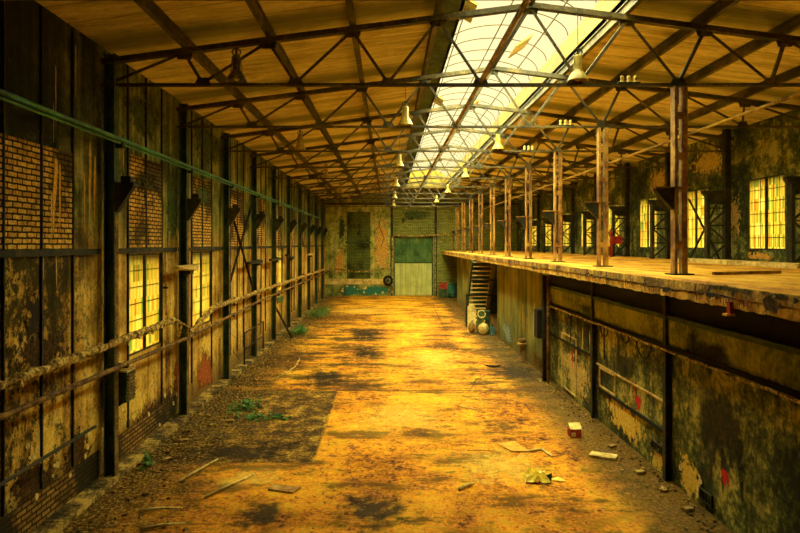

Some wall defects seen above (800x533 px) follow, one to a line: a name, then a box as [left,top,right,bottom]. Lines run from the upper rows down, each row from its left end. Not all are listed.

flaking render [6,295,69,372]
water stain [614,350,641,410]
water stain [687,339,730,379]
flaking render [6,406,104,511]
flaking render [607,398,663,472]
flaking render [679,449,703,501]
water stain [700,388,749,507]